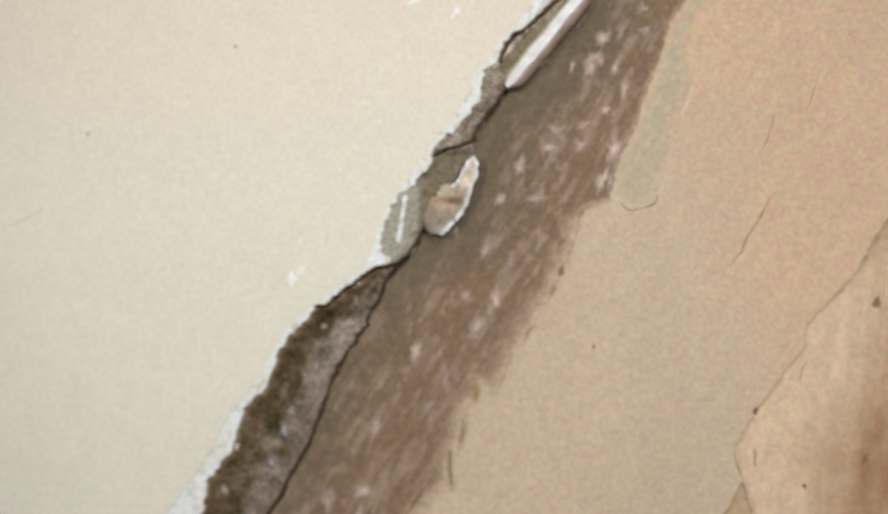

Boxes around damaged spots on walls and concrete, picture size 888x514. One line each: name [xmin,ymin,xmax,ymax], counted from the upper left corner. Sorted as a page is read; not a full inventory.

crack [266,229,426,514]
peeling [163,0,710,514]
crack [432,90,507,157]
crack [499,0,560,63]
peeling [725,218,888,514]